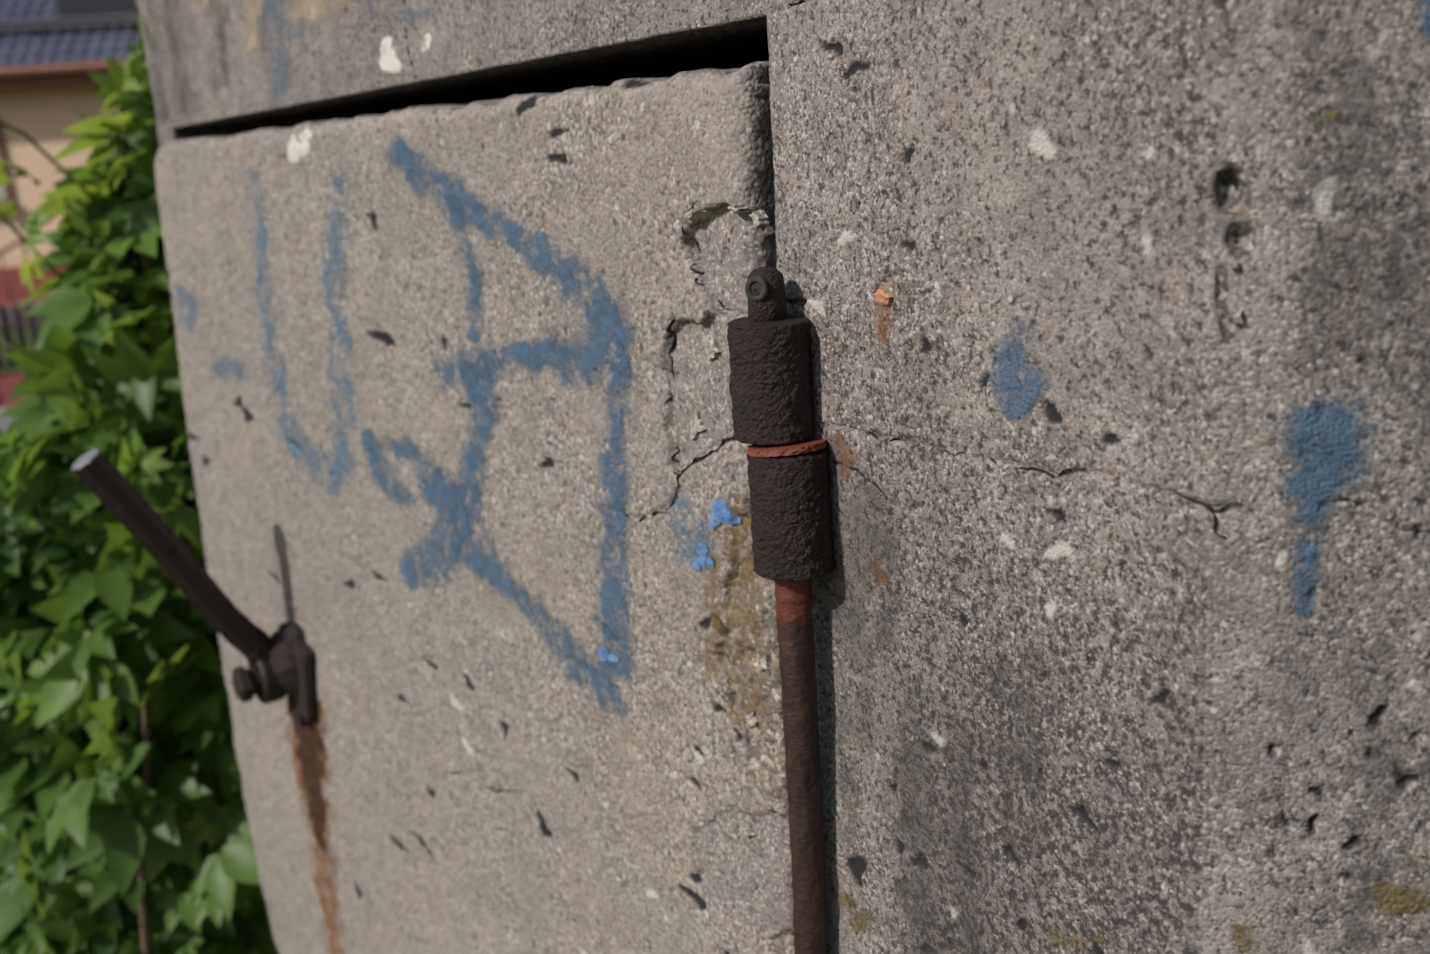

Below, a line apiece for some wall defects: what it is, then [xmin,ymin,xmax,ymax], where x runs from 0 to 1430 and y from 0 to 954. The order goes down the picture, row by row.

crack [681,200,735,314]
crack [664,319,677,409]
spalling [664,204,769,468]
crack [621,436,734,523]
crack [836,461,887,500]
crack [943,450,1095,477]
crack [1175,491,1255,538]
corrosion [287,701,343,954]